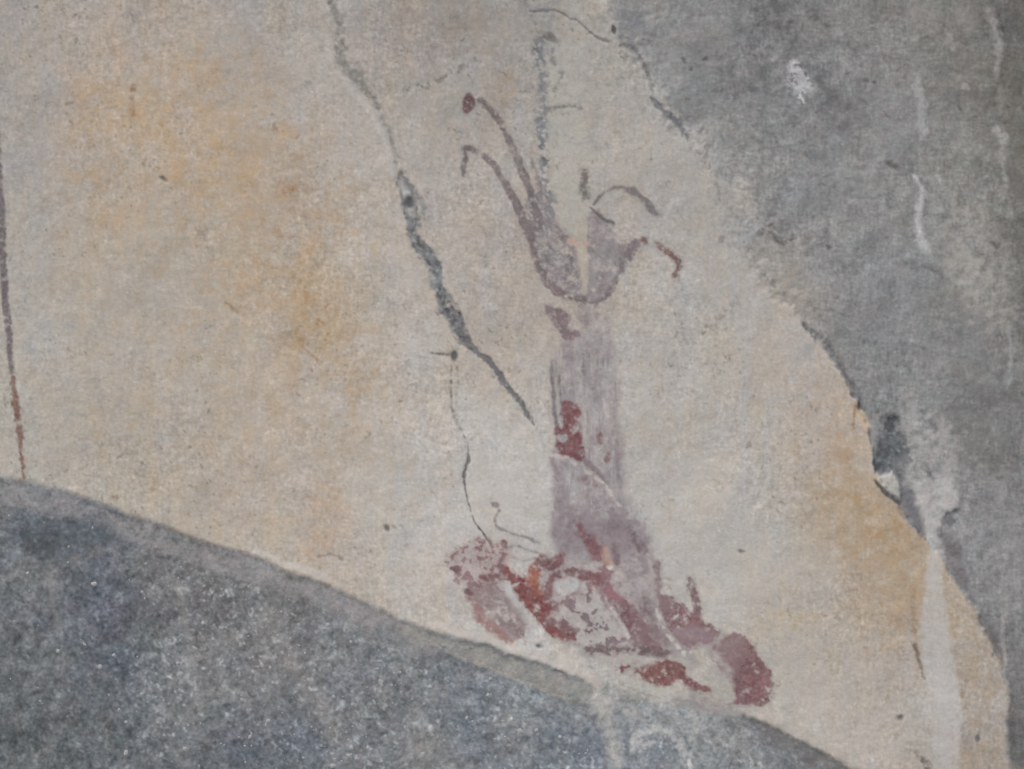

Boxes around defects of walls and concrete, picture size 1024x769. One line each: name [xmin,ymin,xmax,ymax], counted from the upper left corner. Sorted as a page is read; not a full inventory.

spalling [768,55,815,109]
crack [326,0,537,535]
spalling [800,319,923,535]
flaking render [938,507,1002,661]